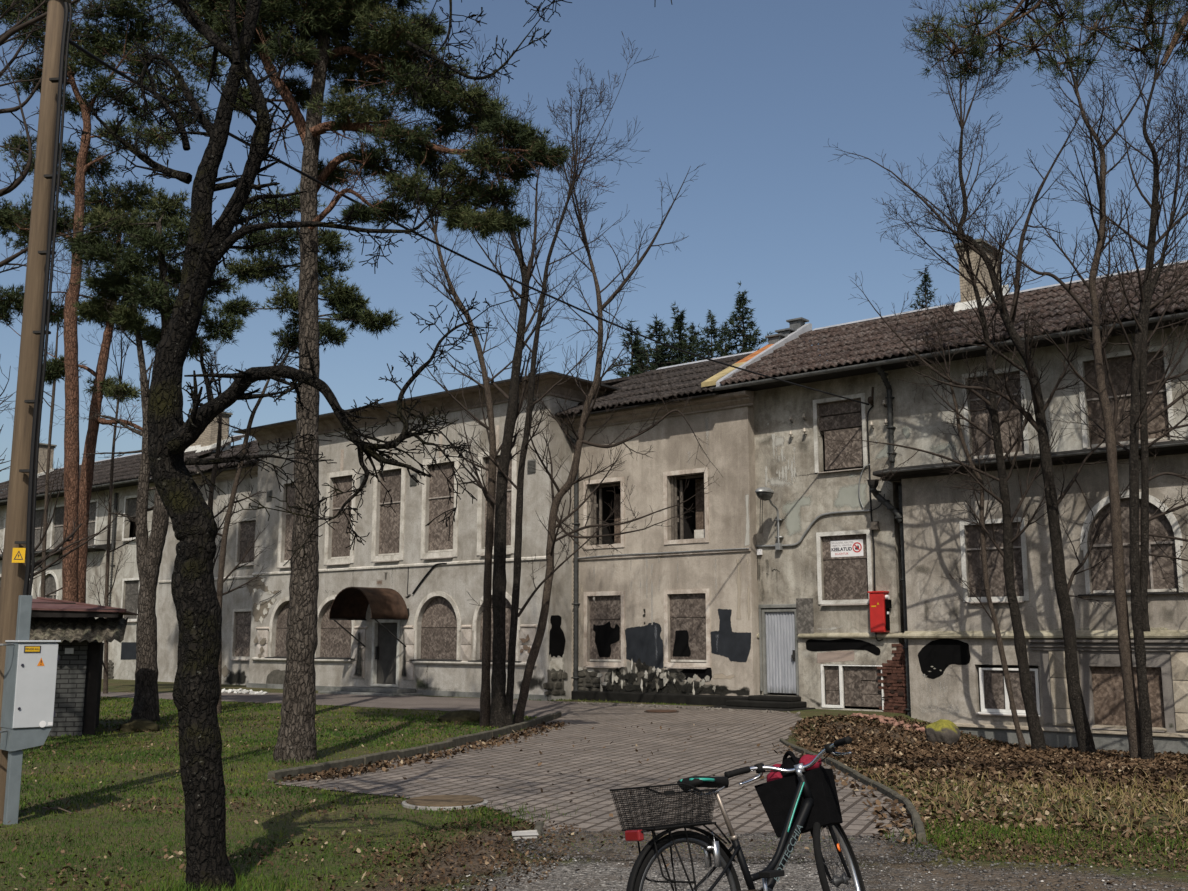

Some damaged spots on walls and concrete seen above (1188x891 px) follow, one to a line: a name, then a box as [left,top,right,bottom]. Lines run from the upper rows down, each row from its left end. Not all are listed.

peeling [247,577,279,658]
flaking render [266,670,285,684]
flaking render [877,644,908,713]